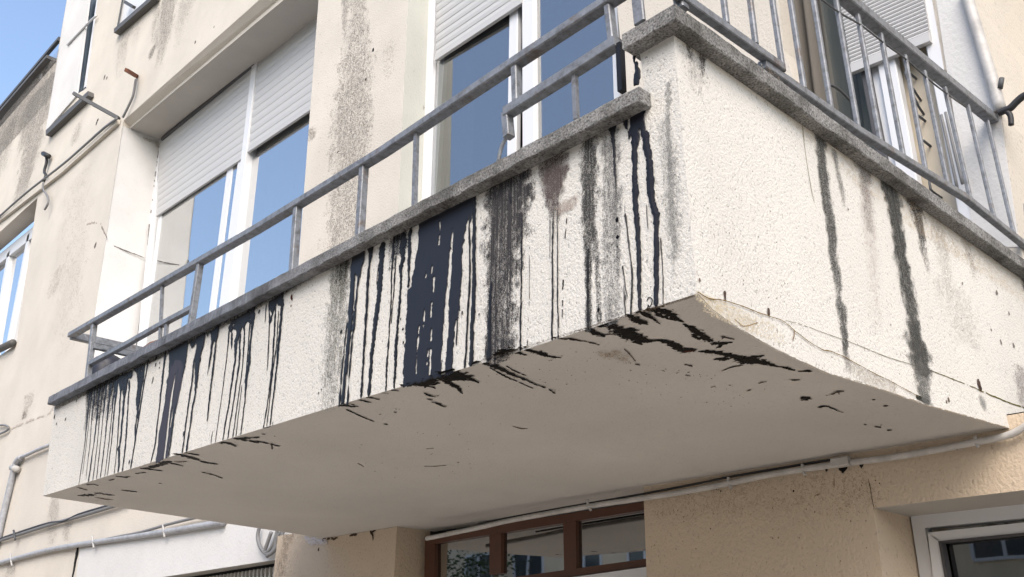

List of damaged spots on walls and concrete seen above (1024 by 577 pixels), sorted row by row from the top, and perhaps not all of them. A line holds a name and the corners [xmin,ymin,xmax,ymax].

crack [87,147,159,258]
damp [319,258,351,414]
damp [317,0,395,254]
damp [538,126,624,333]
crack [698,292,1024,408]
damp [787,115,1024,405]